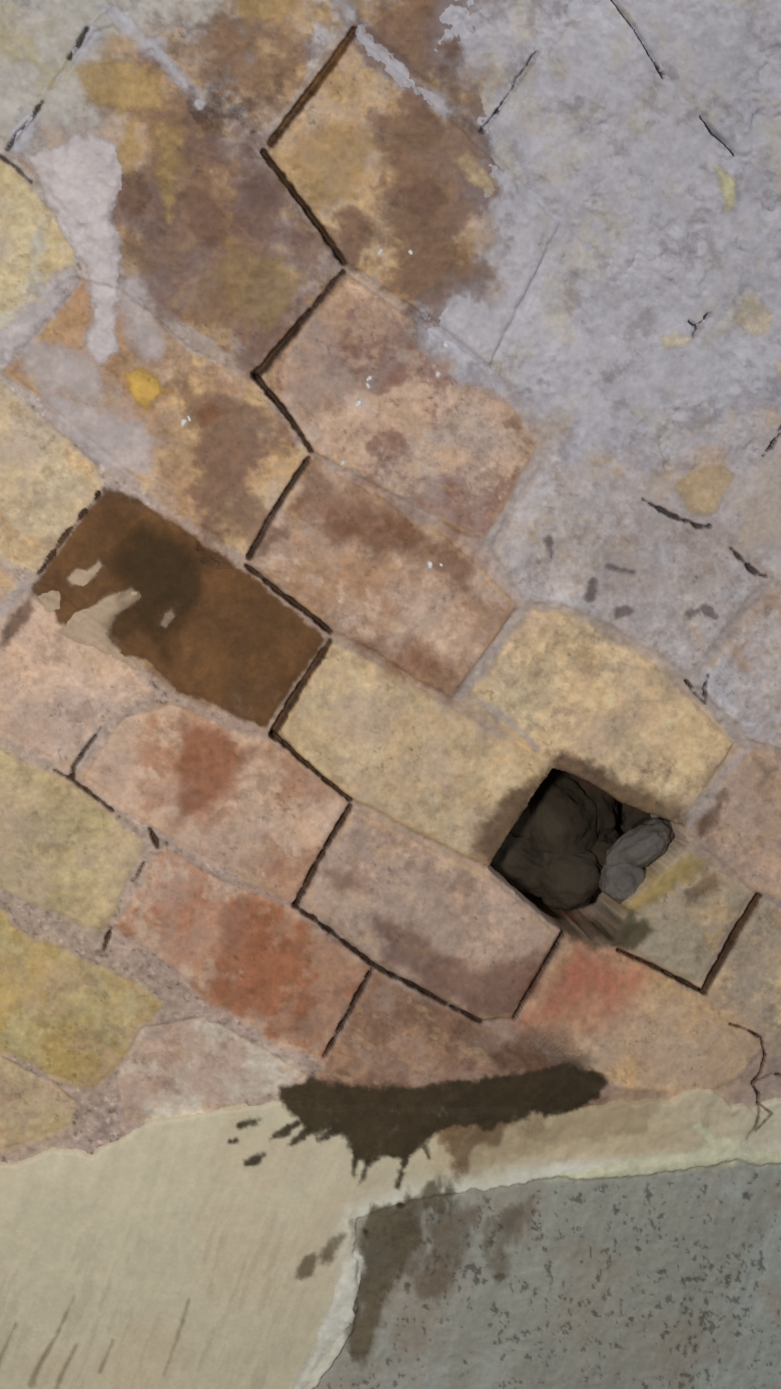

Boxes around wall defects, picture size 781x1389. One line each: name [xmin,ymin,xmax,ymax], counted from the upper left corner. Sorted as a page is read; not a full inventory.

leakage [0,0,253,473]
leakage [335,0,781,472]
leakage [32,491,323,726]
spalling [490,768,674,911]
leakage [229,1120,256,1143]
leakage [245,1154,265,1166]
leakage [273,1064,607,1208]
crack [729,1023,779,1130]